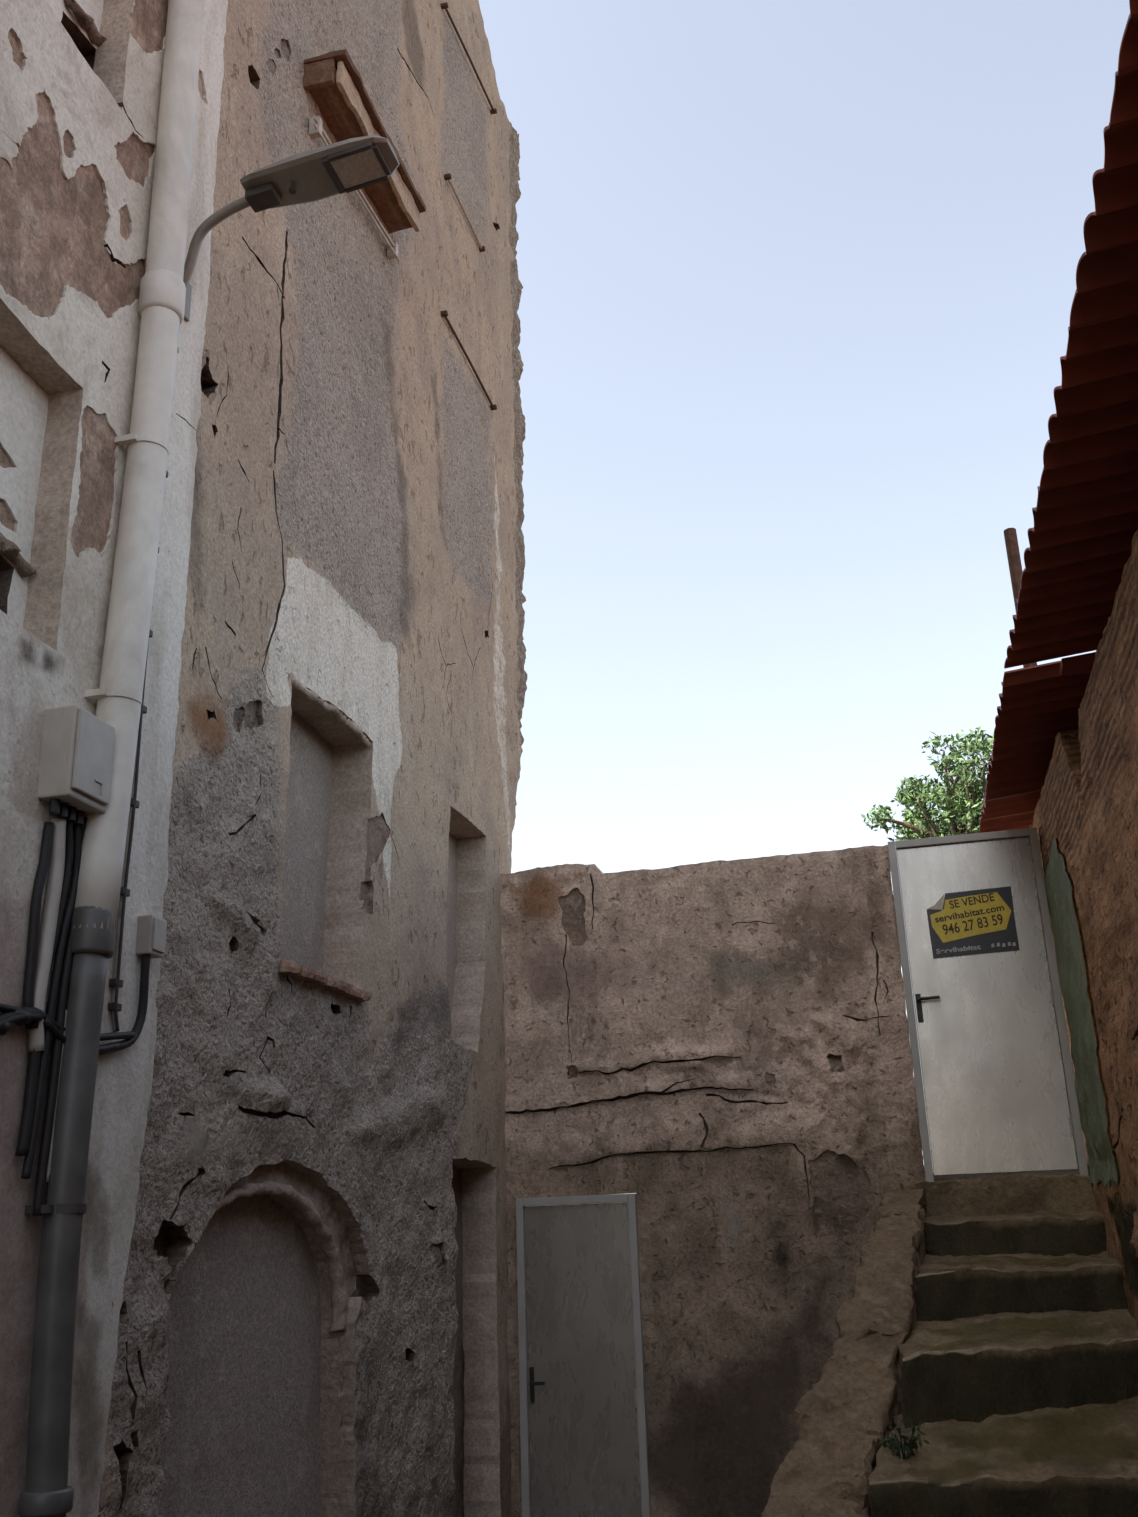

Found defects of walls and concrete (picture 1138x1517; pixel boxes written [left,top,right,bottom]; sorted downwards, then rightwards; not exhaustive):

flaking render [8,30,24,69]
flaking render [0,92,145,318]
flaking render [114,134,155,187]
crack [176,372,229,430]
flaking render [71,406,116,557]
crack [192,230,290,699]
spalling [0,500,36,578]
spalling [359,813,391,915]
flaking render [558,888,587,946]
crack [223,975,315,1129]
crack [505,874,810,1200]
spalling [153,1220,193,1292]